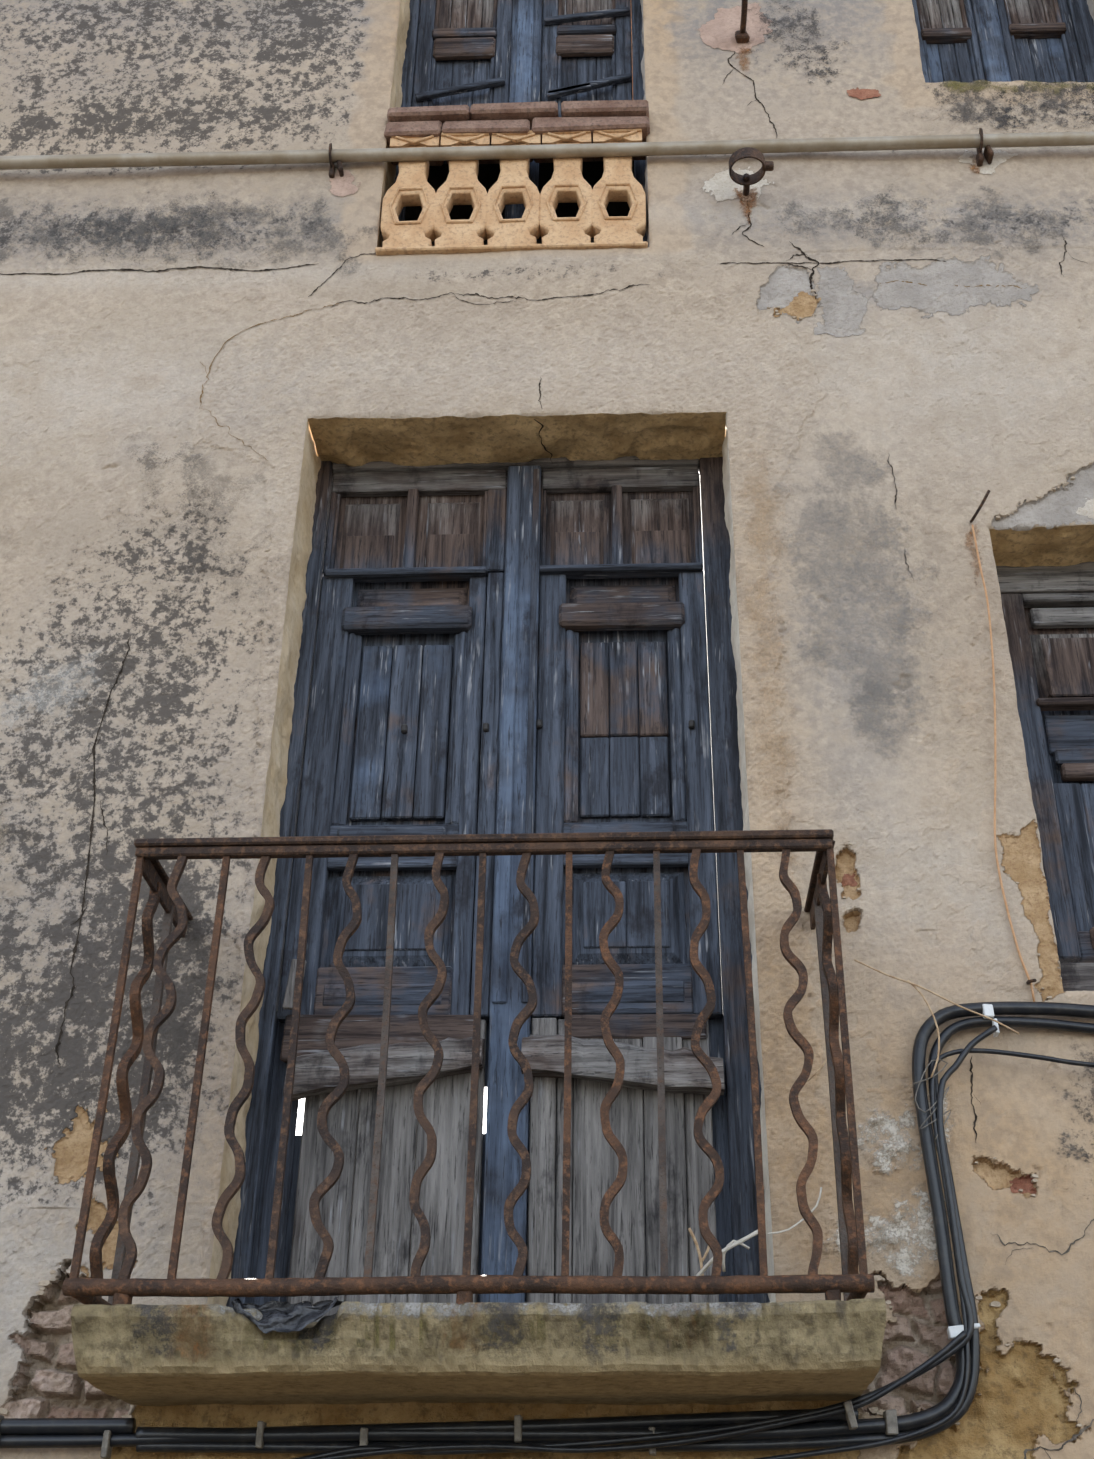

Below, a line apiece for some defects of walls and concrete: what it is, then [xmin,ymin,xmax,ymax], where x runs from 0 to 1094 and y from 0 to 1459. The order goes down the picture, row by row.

damp [748,1,847,83]
crack [723,51,777,134]
damp [933,80,1094,131]
flaking render [873,255,1039,319]
crack [0,252,649,463]
flaking render [997,820,1065,1001]
crack [969,1057,981,1141]
flaking render [44,1105,118,1184]
crack [994,1219,1094,1265]
flaking render [0,1198,861,1459]
flaking render [858,1189,956,1419]
flaking render [897,1289,1082,1459]